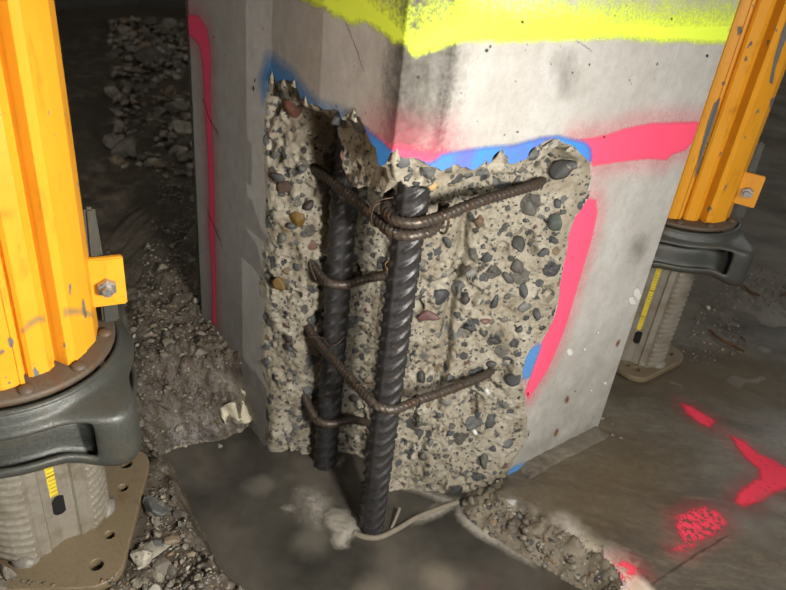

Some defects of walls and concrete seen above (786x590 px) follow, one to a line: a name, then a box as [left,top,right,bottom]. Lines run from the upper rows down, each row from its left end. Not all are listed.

spalling [159,424,248,456]
spalling [259,70,620,590]